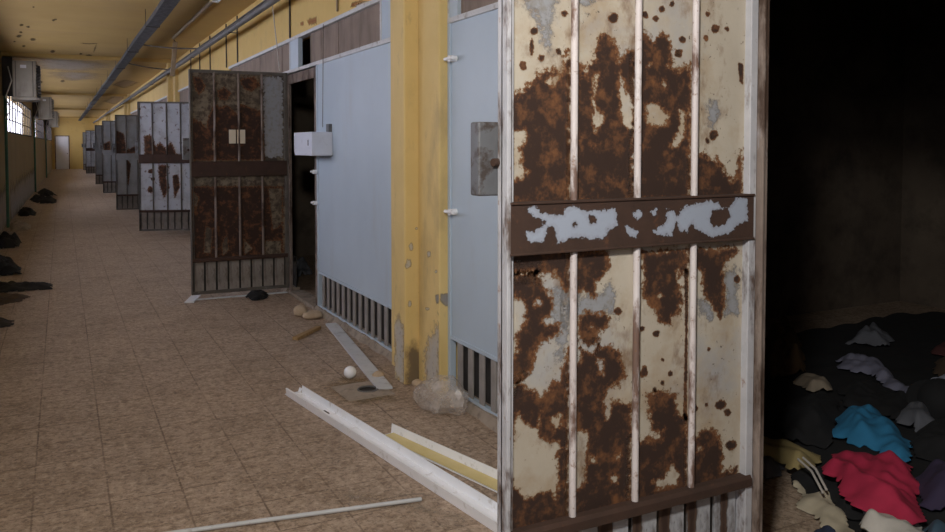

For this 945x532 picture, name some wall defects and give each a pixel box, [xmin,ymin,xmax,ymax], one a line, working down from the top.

corrosion [191,86,266,161]
corrosion [514,1,744,202]
corrosion [103,131,180,198]
corrosion [192,185,284,259]
peeling [394,317,404,383]
peeling [424,324,439,395]
corrosion [513,244,741,532]